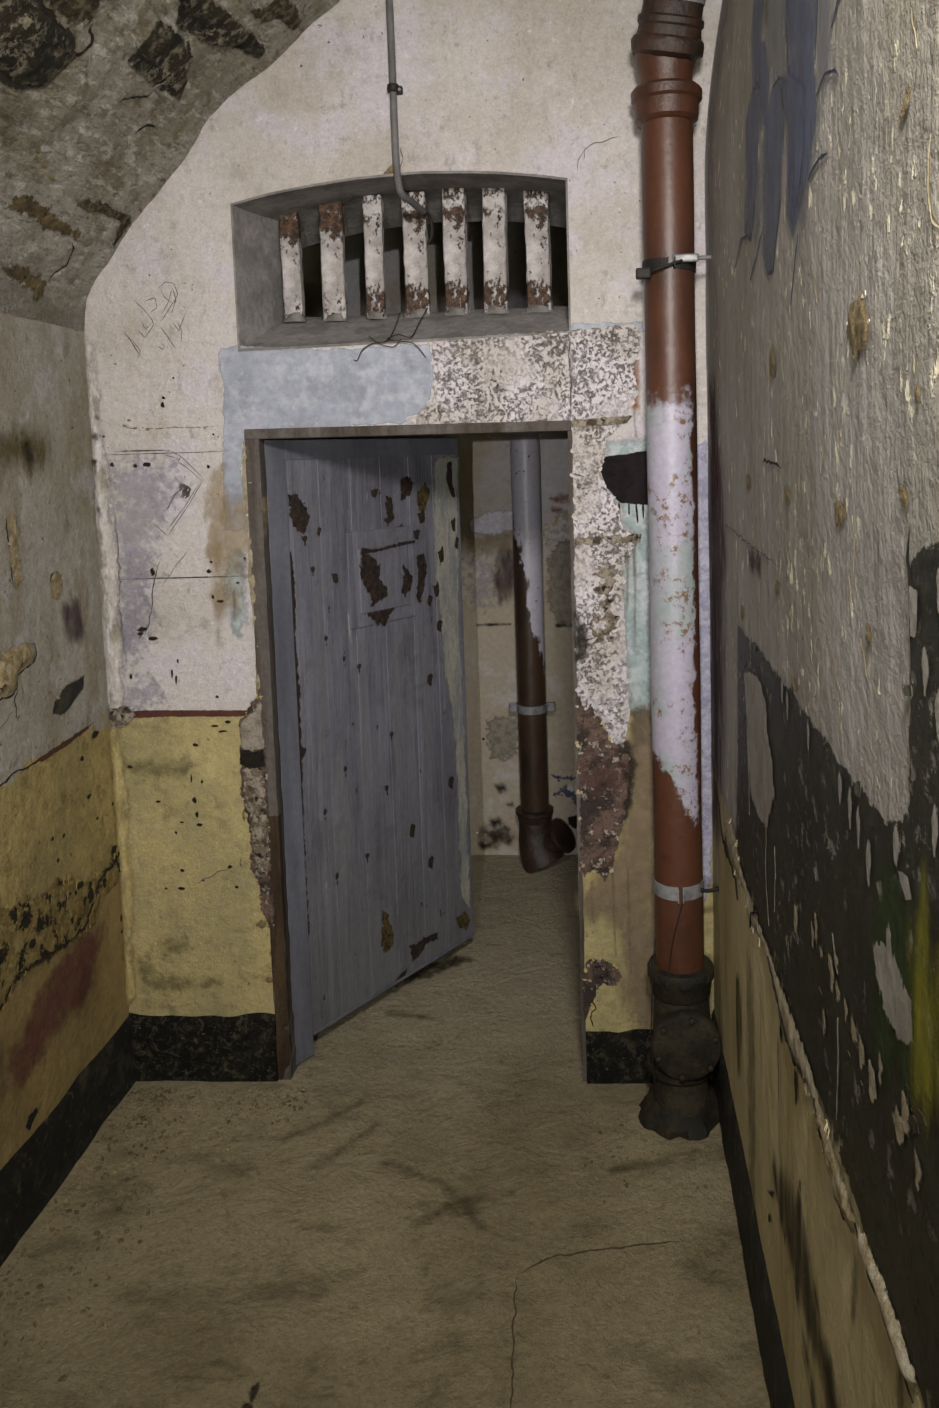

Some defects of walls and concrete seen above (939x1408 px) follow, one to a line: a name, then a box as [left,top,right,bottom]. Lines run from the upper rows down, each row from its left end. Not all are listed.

peeling [834,500,846,528]
peeling [898,483,910,509]
flaking render [211,442,275,930]
peeling [405,322,644,887]
flaking render [0,845,121,1011]
peeling [729,541,939,1408]
crack [510,1240,686,1408]